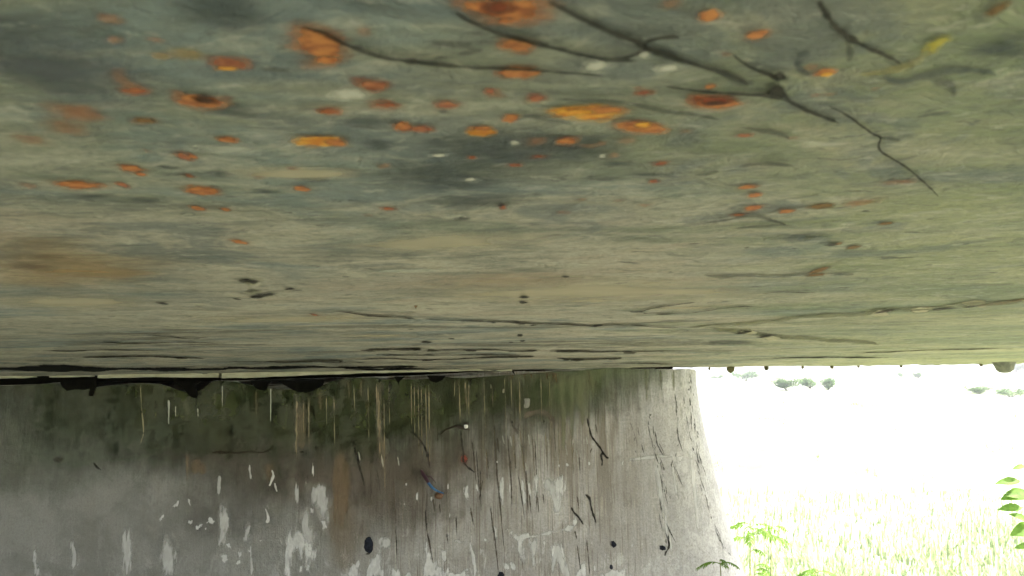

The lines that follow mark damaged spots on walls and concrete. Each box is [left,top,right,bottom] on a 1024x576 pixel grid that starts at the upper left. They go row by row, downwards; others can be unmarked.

corrosion [292,26,343,64]
corrosion [496,39,541,78]
corrosion [295,137,346,147]
corrosion [528,93,668,134]
crack [297,1,938,196]
water stain [226,372,597,567]
peeling [500,435,591,512]
crack [587,418,609,466]
peeling [188,506,262,575]
peeling [284,466,329,576]
peeling [348,538,477,576]
peeling [504,516,631,576]